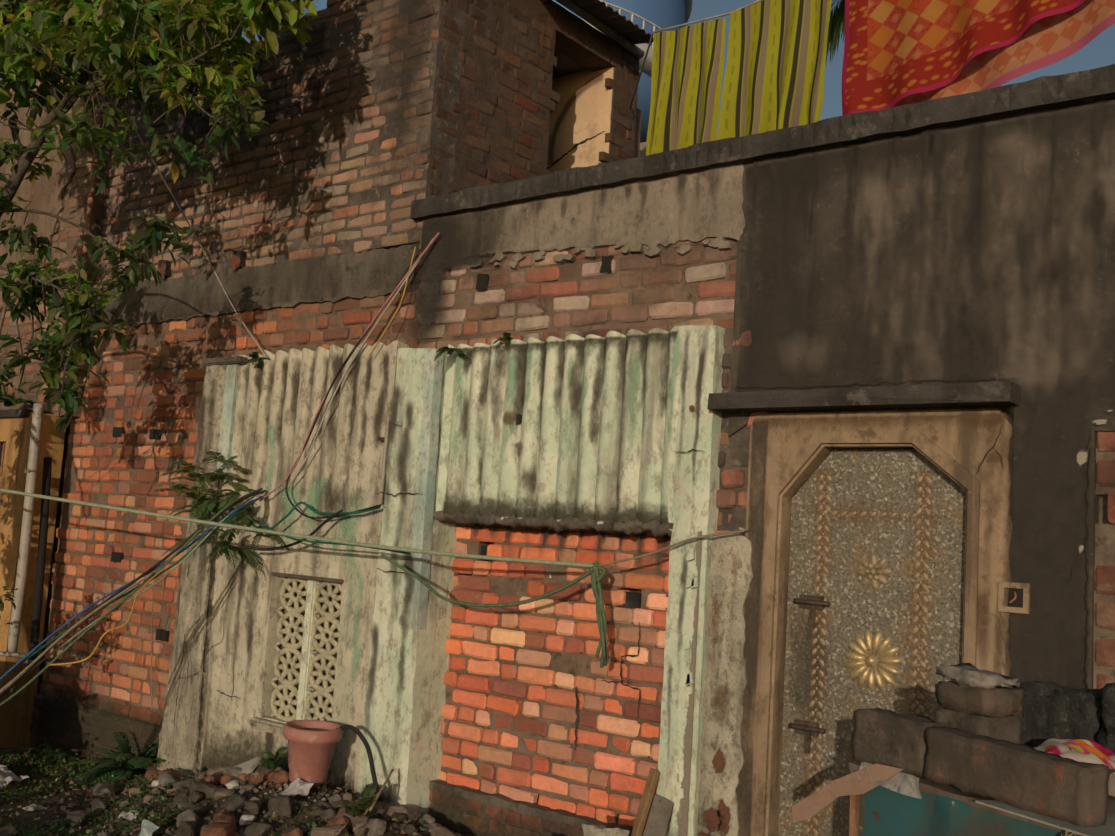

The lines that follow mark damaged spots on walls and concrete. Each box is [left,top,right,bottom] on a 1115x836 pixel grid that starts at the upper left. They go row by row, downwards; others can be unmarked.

crack [546,131,605,169]
spalling [468,237,733,291]
water stain [737,104,1115,392]
water stain [245,354,411,504]
water stain [461,337,647,441]
water stain [443,472,670,560]
water stain [660,335,704,466]
crack [975,425,1004,475]
water stain [957,335,1115,688]
spalling [1077,451,1087,465]
water stain [391,554,413,691]
peeling [671,531,731,836]